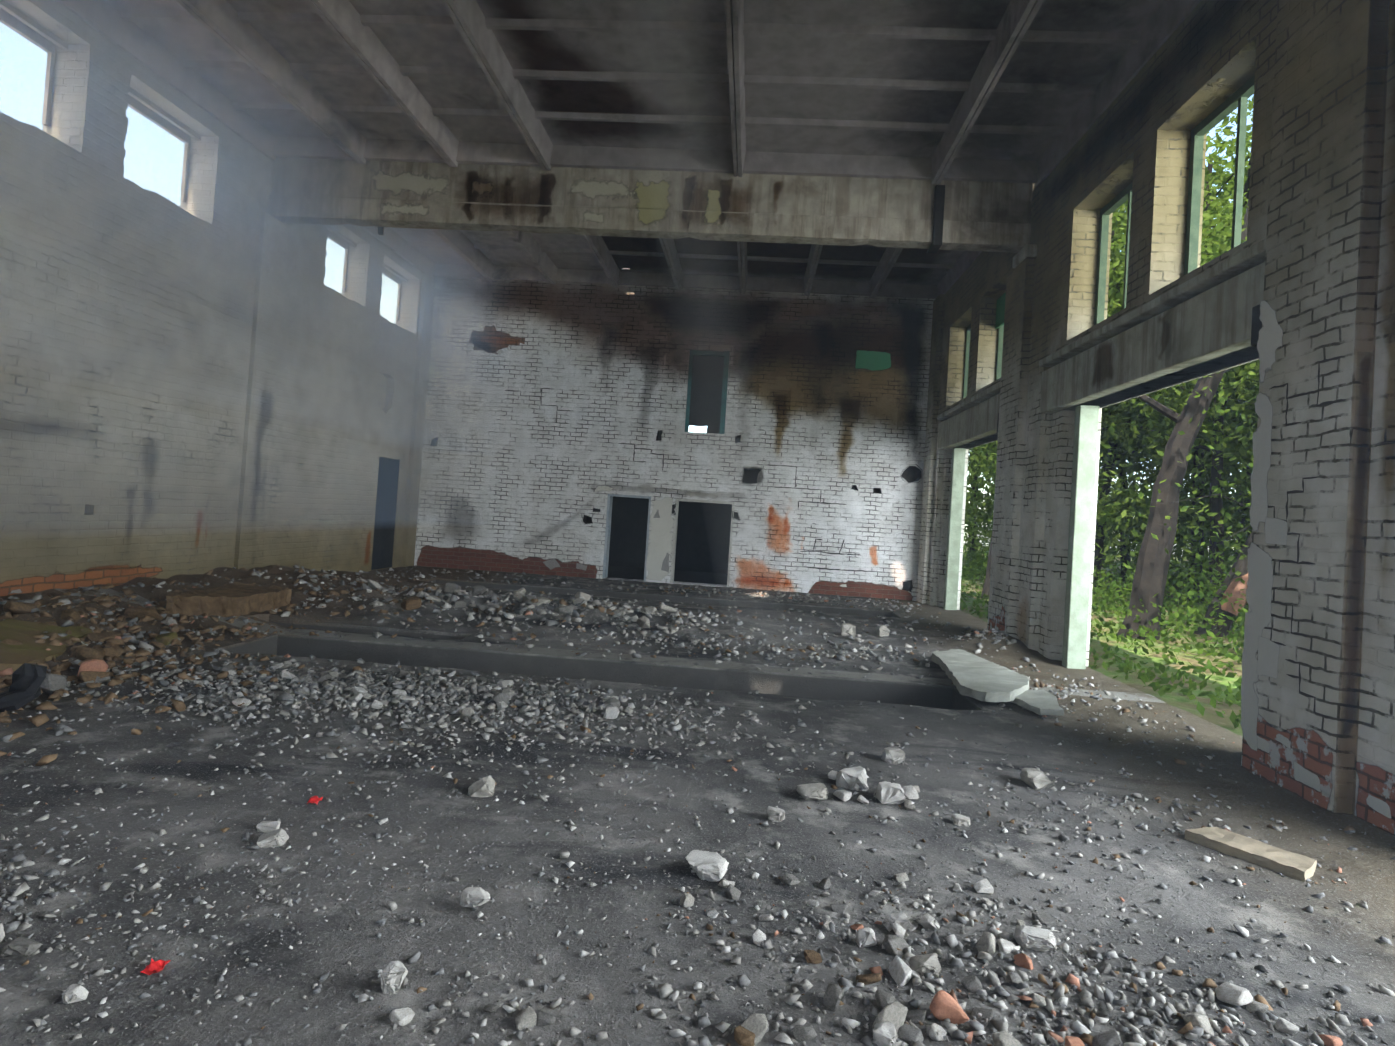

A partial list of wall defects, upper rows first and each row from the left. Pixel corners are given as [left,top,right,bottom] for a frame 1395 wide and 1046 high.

water stain [466,172,555,223]
water stain [683,178,749,224]
spalling [469,325,525,355]
water stain [748,325,915,461]
flaking render [0,565,162,597]
flaking render [417,546,597,579]
flaking render [808,580,914,601]
peeling [1240,300,1333,810]
flaking render [1356,762,1395,836]